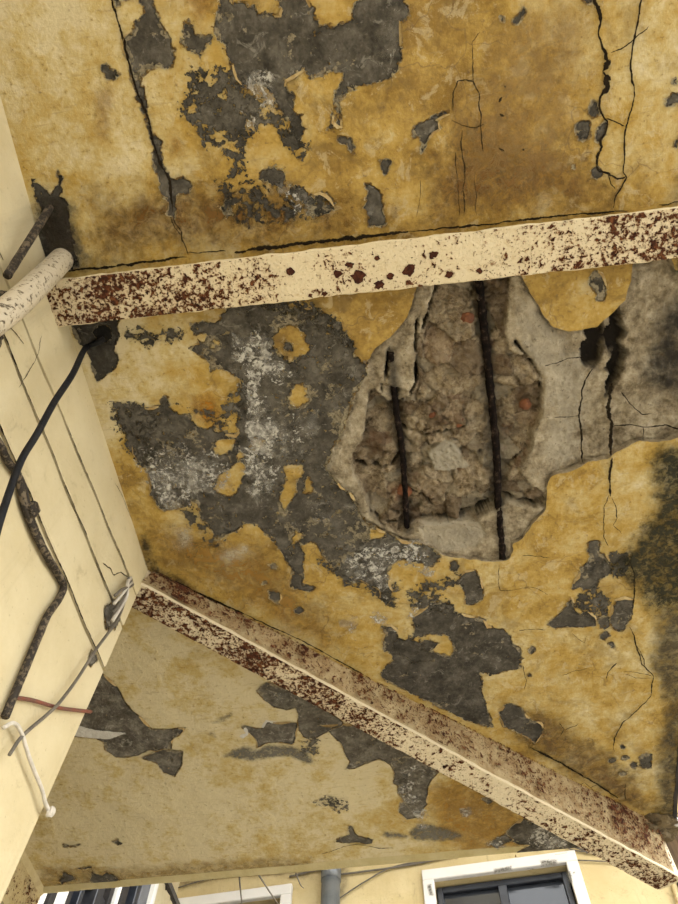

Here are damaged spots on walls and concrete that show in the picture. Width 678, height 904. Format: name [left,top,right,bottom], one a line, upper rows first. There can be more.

peeling [100,0,411,229]
crack [68,0,649,272]
corrosion [47,255,295,326]
corrosion [307,208,678,298]
spalling [70,259,678,744]
crack [545,357,593,462]
crack [603,383,678,545]
peeling [74,673,186,777]
peeling [226,682,461,841]
peeling [335,826,374,845]
corrosion [132,572,677,889]
crack [565,562,654,752]